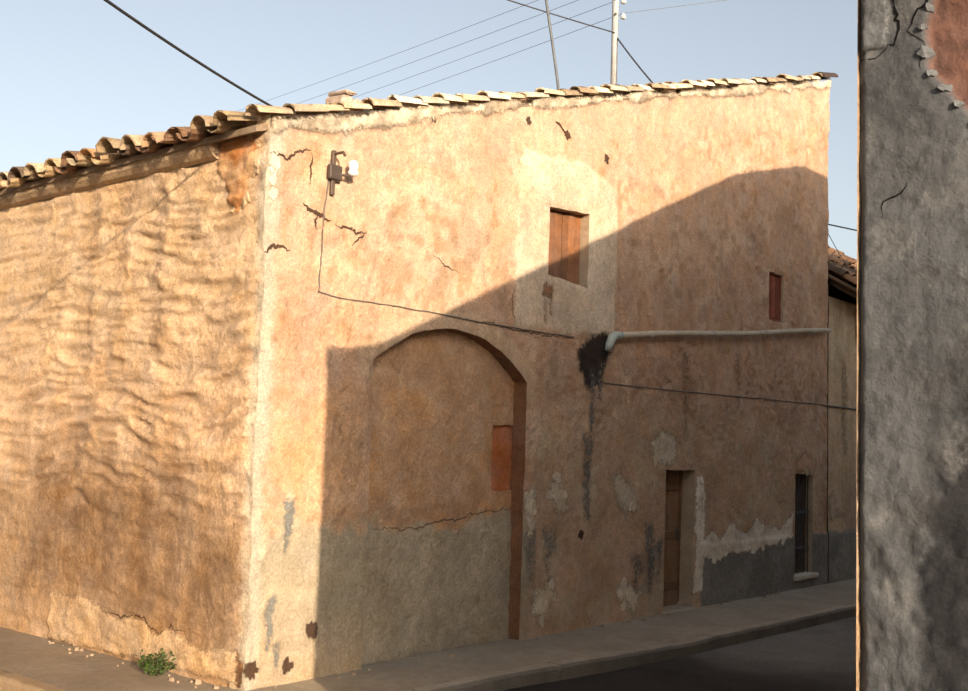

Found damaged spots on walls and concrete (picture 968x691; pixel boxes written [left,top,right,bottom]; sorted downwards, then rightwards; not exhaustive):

crack [861,0,928,67]
spalling [218,134,280,213]
peeling [650,431,676,468]
water stain [284,501,295,548]
crack [377,508,510,532]
peeling [693,476,794,594]
peeling [46,591,243,689]
water stain [264,596,279,667]